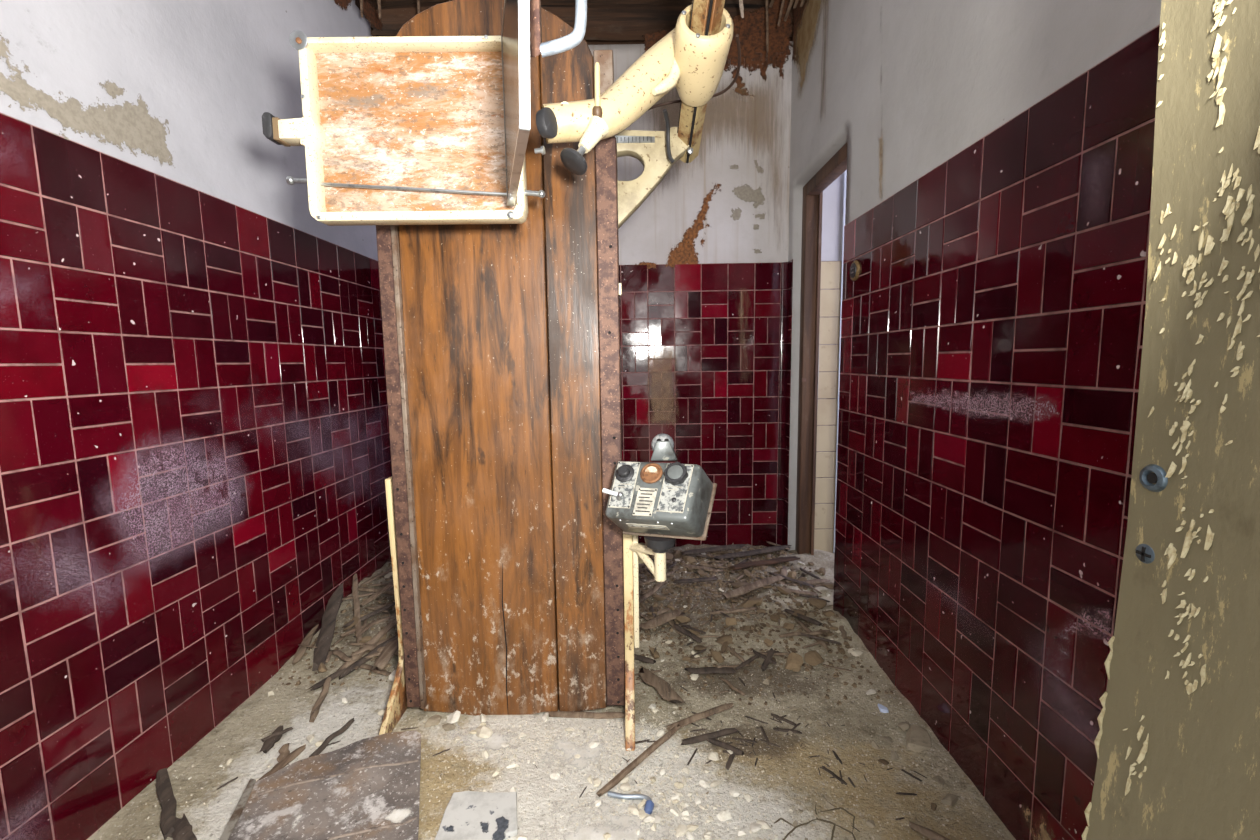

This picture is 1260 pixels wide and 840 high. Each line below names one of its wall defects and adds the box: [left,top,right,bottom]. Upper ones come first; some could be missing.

peeling [0,32,174,165]
spalling [334,0,383,31]
spalling [642,30,672,52]
spalling [724,0,809,97]
peeling [1158,23,1166,80]
peeling [1207,0,1237,127]
peeling [1153,163,1260,413]
peeling [1165,359,1201,489]
leakage [118,445,238,559]
peeling [1160,507,1214,695]
crack [774,804,856,840]